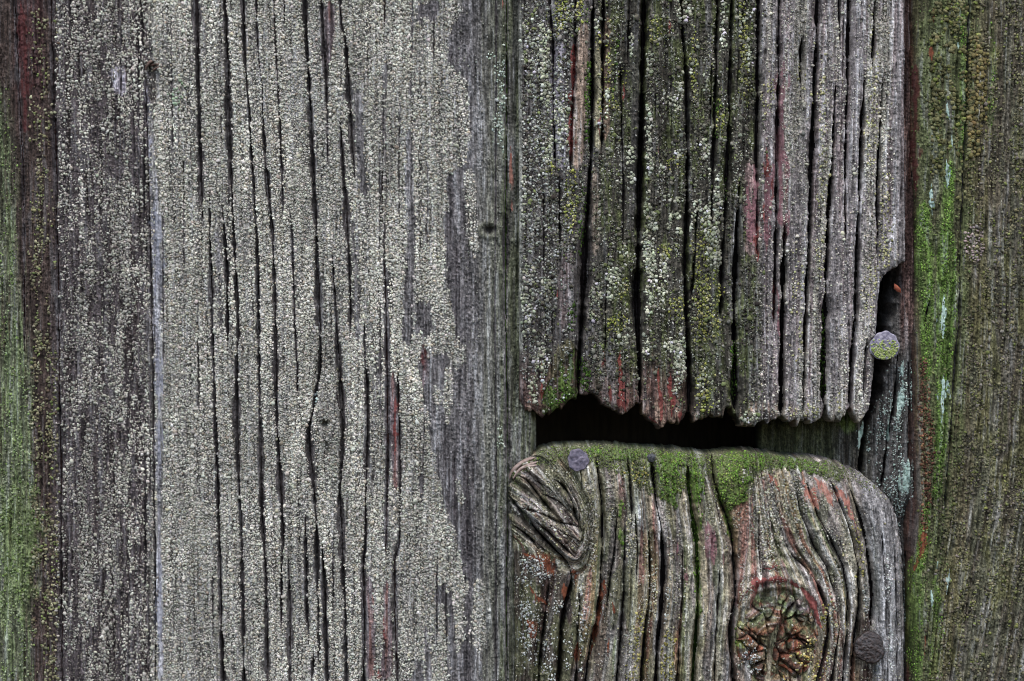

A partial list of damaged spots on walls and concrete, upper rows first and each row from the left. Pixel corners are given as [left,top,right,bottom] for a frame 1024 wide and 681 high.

crack [195,0,401,681]
crack [494,0,910,681]